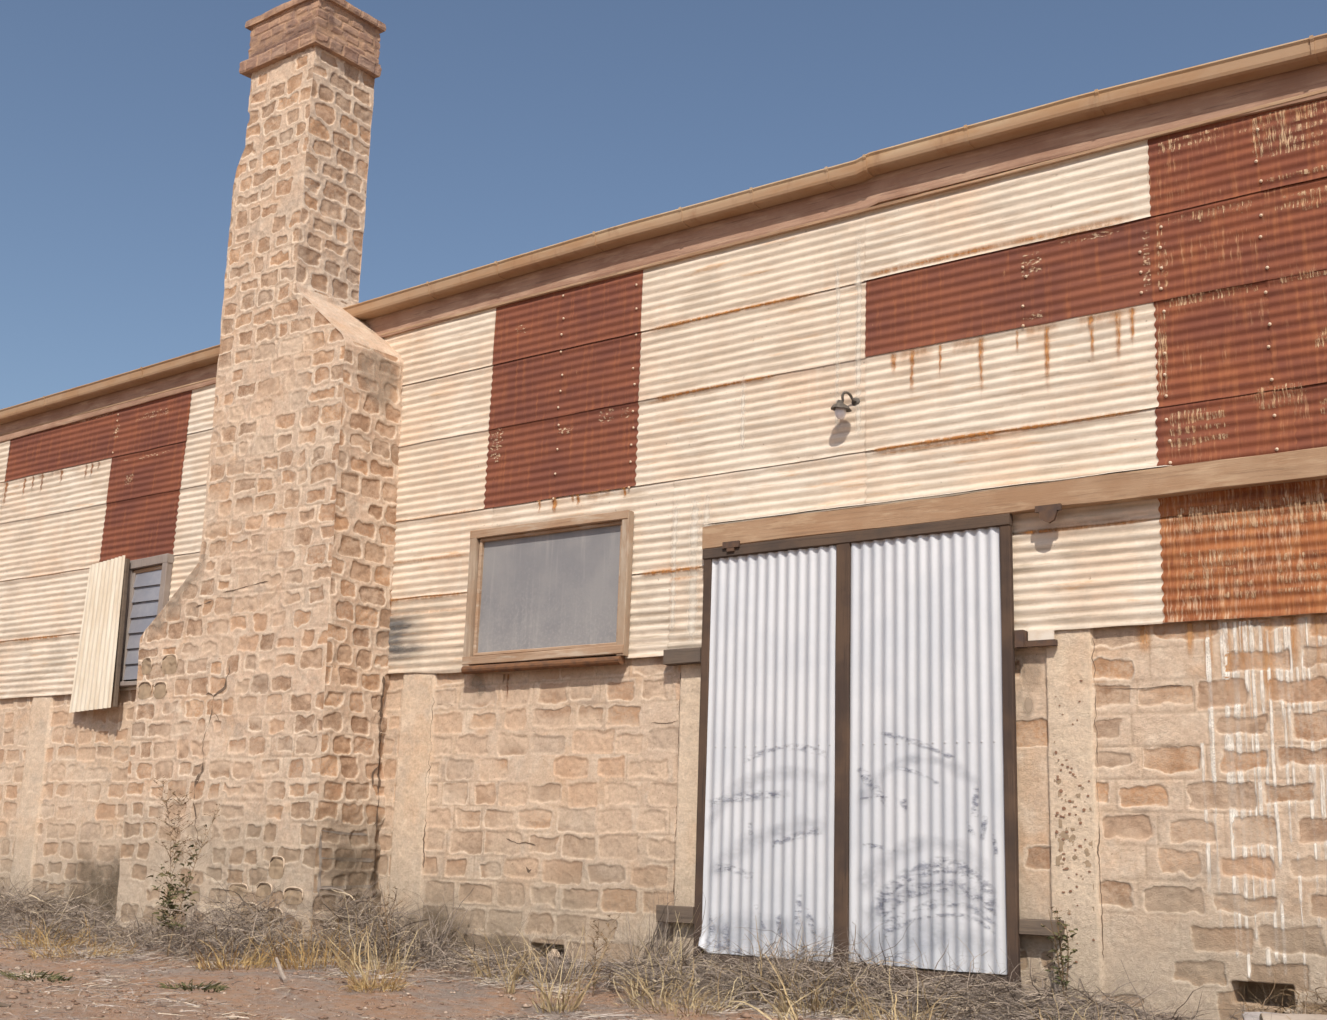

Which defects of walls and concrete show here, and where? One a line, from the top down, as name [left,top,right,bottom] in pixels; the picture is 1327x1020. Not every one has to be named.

rust [874,246,992,275]
rust [1116,308,1134,345]
crack [196,581,268,607]
leakage [388,619,414,653]
crack [193,667,230,844]
leakage [1201,617,1327,874]
leakage [1232,876,1286,965]